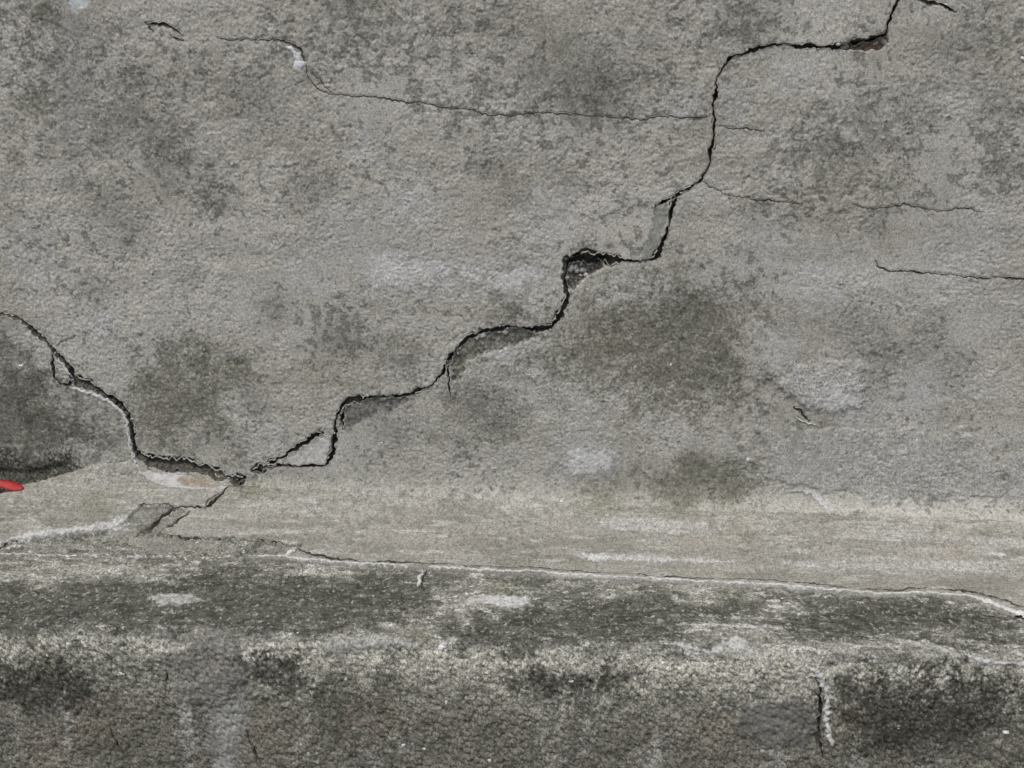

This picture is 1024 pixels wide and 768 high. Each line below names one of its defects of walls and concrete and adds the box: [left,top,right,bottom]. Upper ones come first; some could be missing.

crack [918,0,956,13]
crack [854,201,980,212]
crack [0,0,901,541]
crack [875,261,1024,281]
spalling [0,507,294,559]
crack [0,537,1024,618]
water stain [0,562,441,717]
water stain [437,592,763,704]
water stain [785,595,1024,760]
water stain [209,680,250,768]